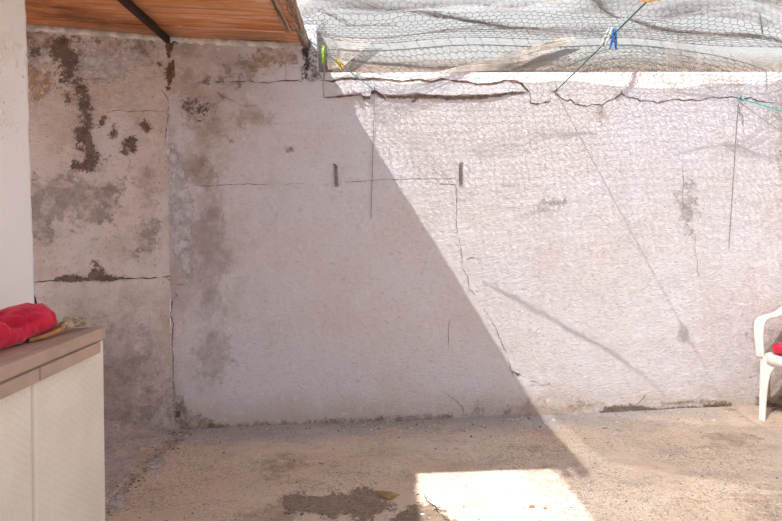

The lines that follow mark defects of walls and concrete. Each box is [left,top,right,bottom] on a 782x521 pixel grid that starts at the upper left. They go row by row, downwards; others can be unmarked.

leakage [26,31,55,76]
leakage [180,96,218,123]
crack [114,64,302,139]
leakage [31,174,126,245]
crack [346,178,547,385]
crack [38,260,182,427]